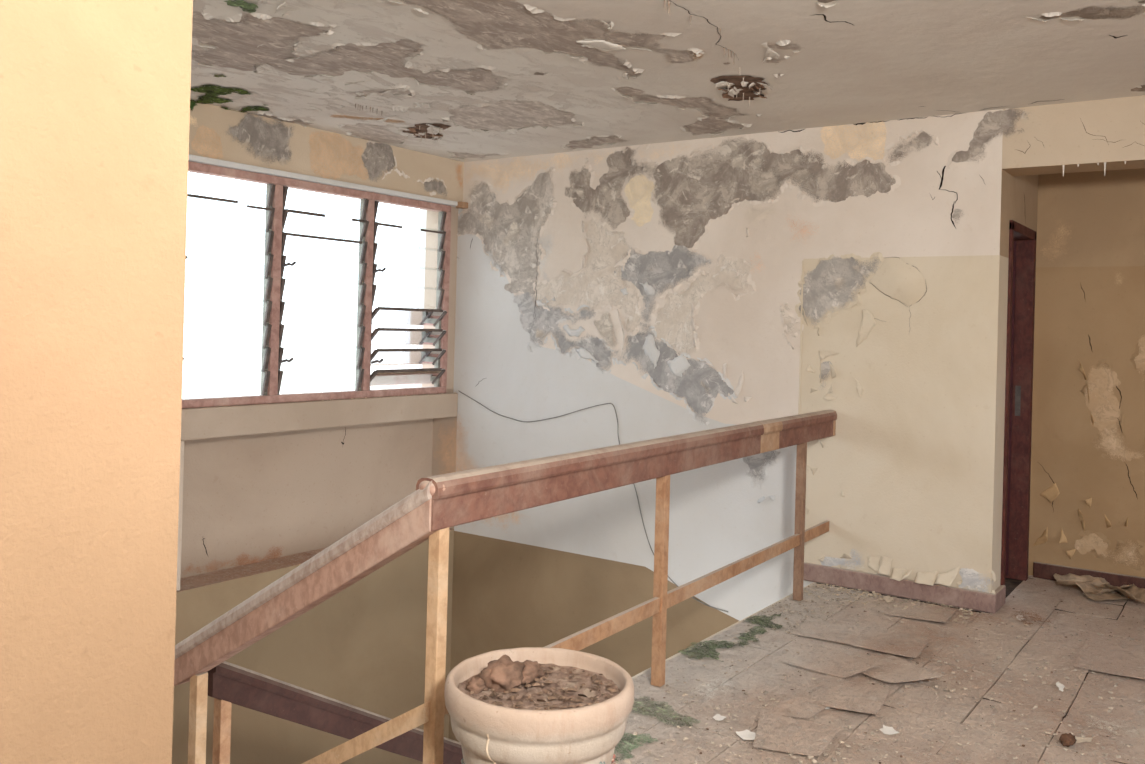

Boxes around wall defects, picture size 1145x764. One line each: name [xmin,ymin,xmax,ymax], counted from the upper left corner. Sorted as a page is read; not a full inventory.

spalling [1025,0,1145,22]
spalling [945,108,1029,169]
spalling [191,0,939,426]
crack [932,166,958,228]
spalling [1078,358,1145,471]
spalling [740,449,781,503]
spalling [1033,498,1145,571]
peeling [818,549,996,594]
peeling [736,729,756,740]
peeling [879,725,900,735]